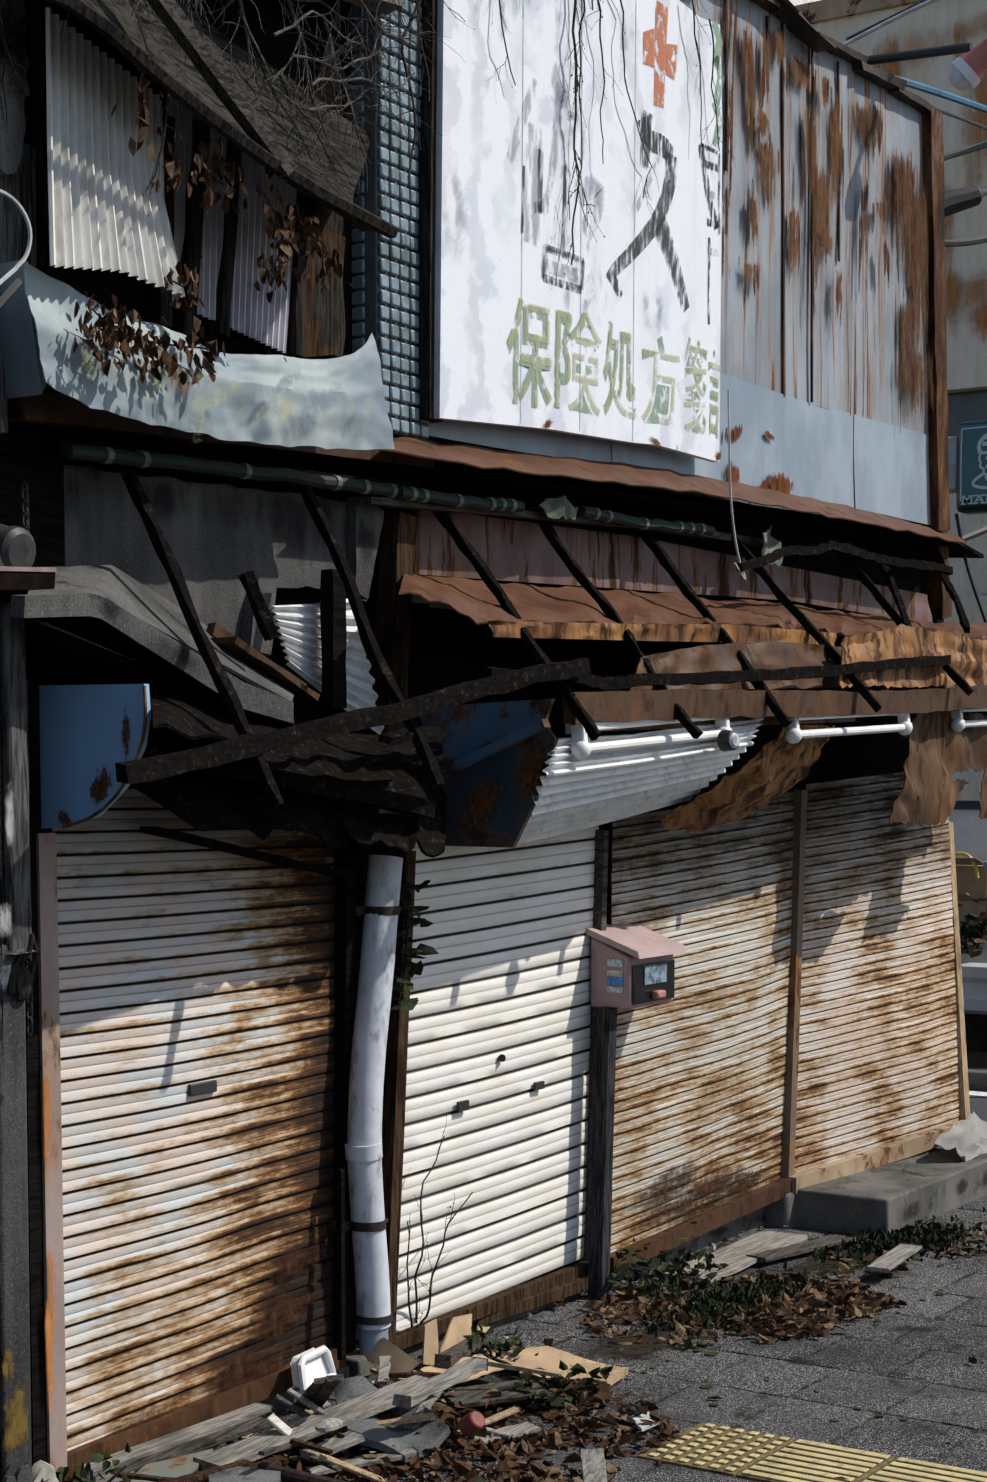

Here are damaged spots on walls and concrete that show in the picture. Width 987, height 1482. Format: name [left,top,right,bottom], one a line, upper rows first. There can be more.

rust [722,4,987,434]
rust [122,707,130,755]
rust [90,767,111,803]
rust [639,1161,767,1226]
rust [203,1244,325,1394]
rust [107,1408,175,1438]